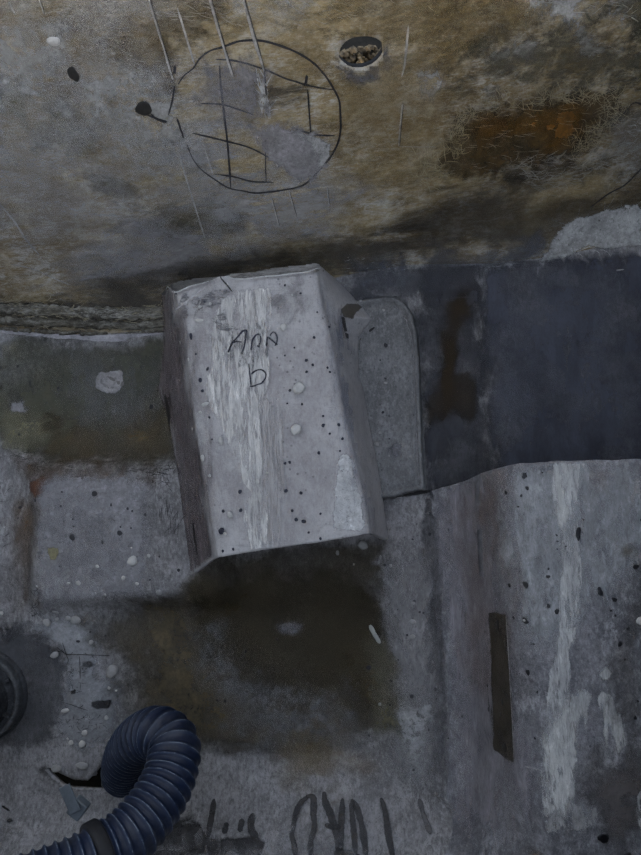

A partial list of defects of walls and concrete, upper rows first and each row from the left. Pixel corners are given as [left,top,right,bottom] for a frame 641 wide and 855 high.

leakage [0,189,641,470]
peeling [476,196,641,270]
leakage [84,541,404,762]